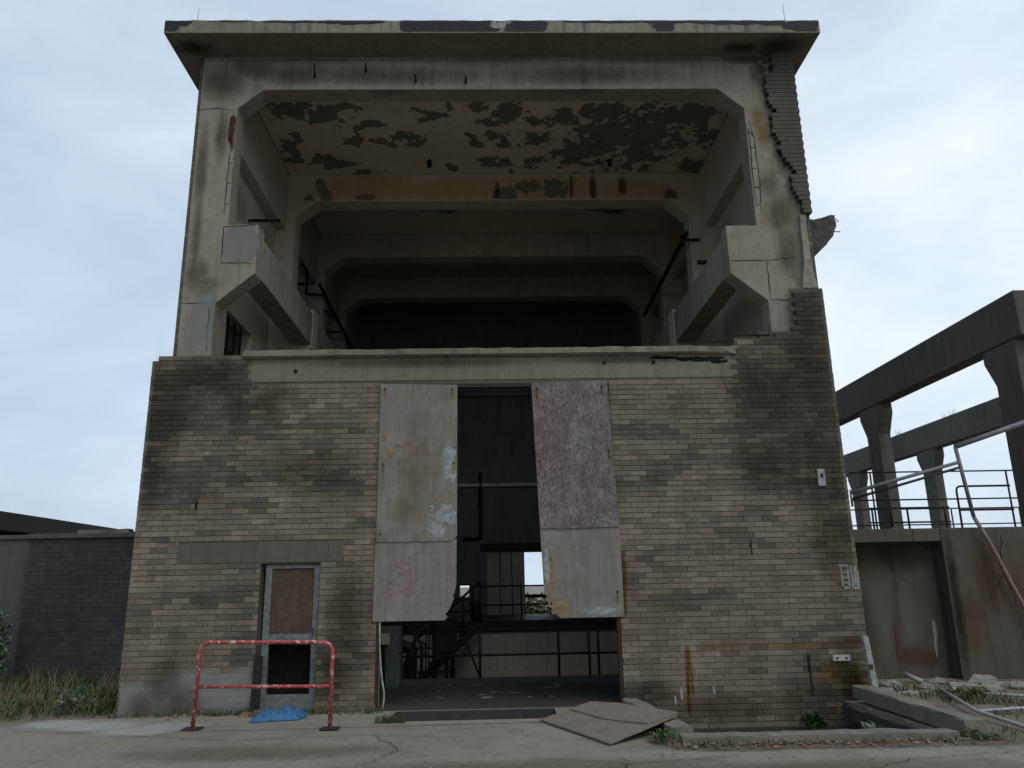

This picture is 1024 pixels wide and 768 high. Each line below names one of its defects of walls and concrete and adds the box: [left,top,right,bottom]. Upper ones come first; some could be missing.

peeling [399,21,548,31]
peeling [261,89,454,201]
peeling [464,89,725,199]
crack [221,149,255,263]
crack [730,257,793,300]
peeling [441,432,457,484]
peeling [426,498,457,538]